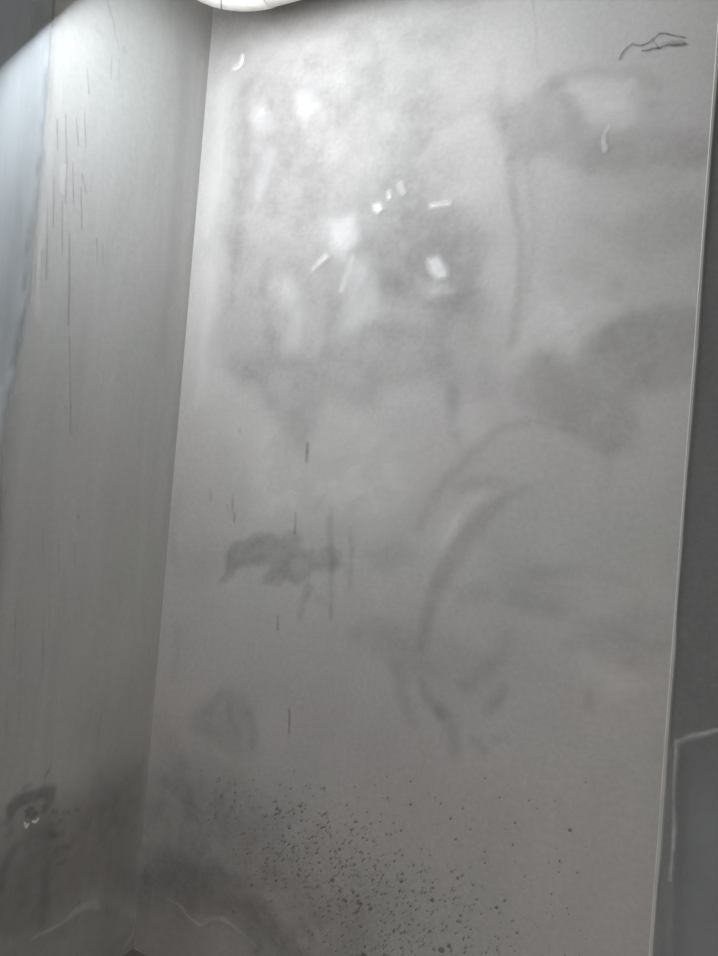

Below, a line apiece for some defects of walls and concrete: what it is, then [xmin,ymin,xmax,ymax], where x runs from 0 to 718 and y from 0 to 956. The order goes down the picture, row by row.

water stain [431,260,445,277]